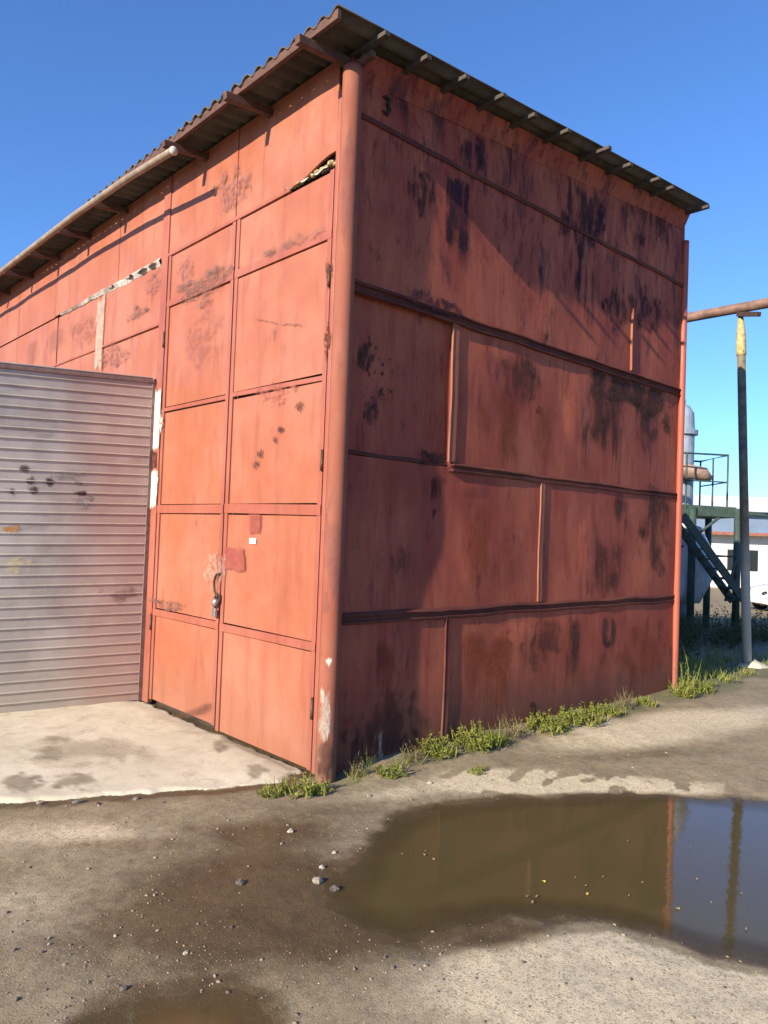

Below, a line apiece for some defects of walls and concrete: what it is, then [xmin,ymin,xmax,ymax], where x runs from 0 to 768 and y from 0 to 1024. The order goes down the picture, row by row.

spalling [284,153,336,197]
peeling [59,258,161,369]
peeling [153,390,163,449]
corrosion [20,466,54,494]
peeling [150,470,158,508]
peeling [319,688,330,741]